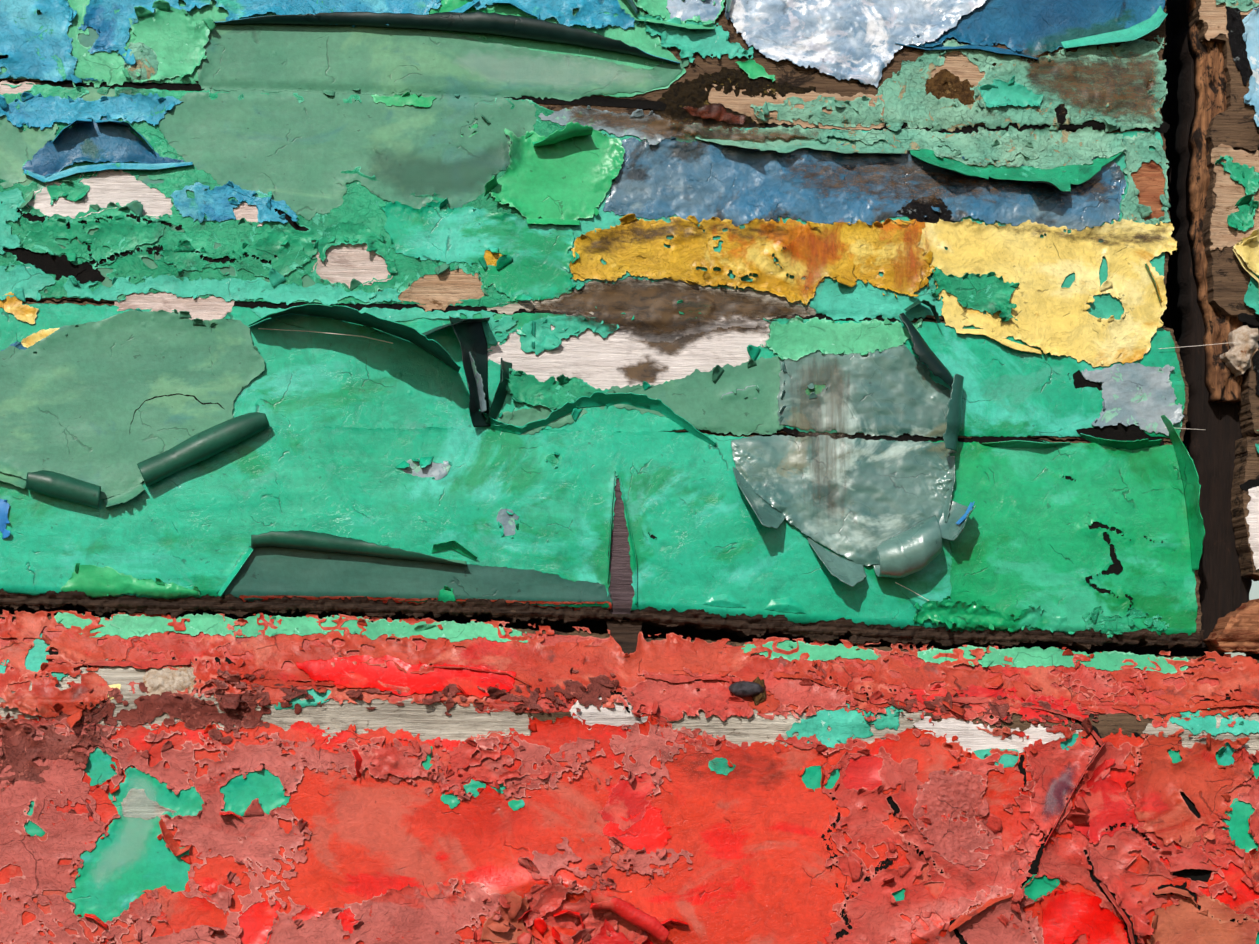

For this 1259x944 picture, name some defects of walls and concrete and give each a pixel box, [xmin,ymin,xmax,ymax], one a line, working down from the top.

peeling [1198,0,1259,127]
corrosion [788,229,839,291]
peeling [54,471,637,643]
crack [1085,521,1163,612]
peeling [1245,486,1259,570]
peeling [0,596,1259,944]